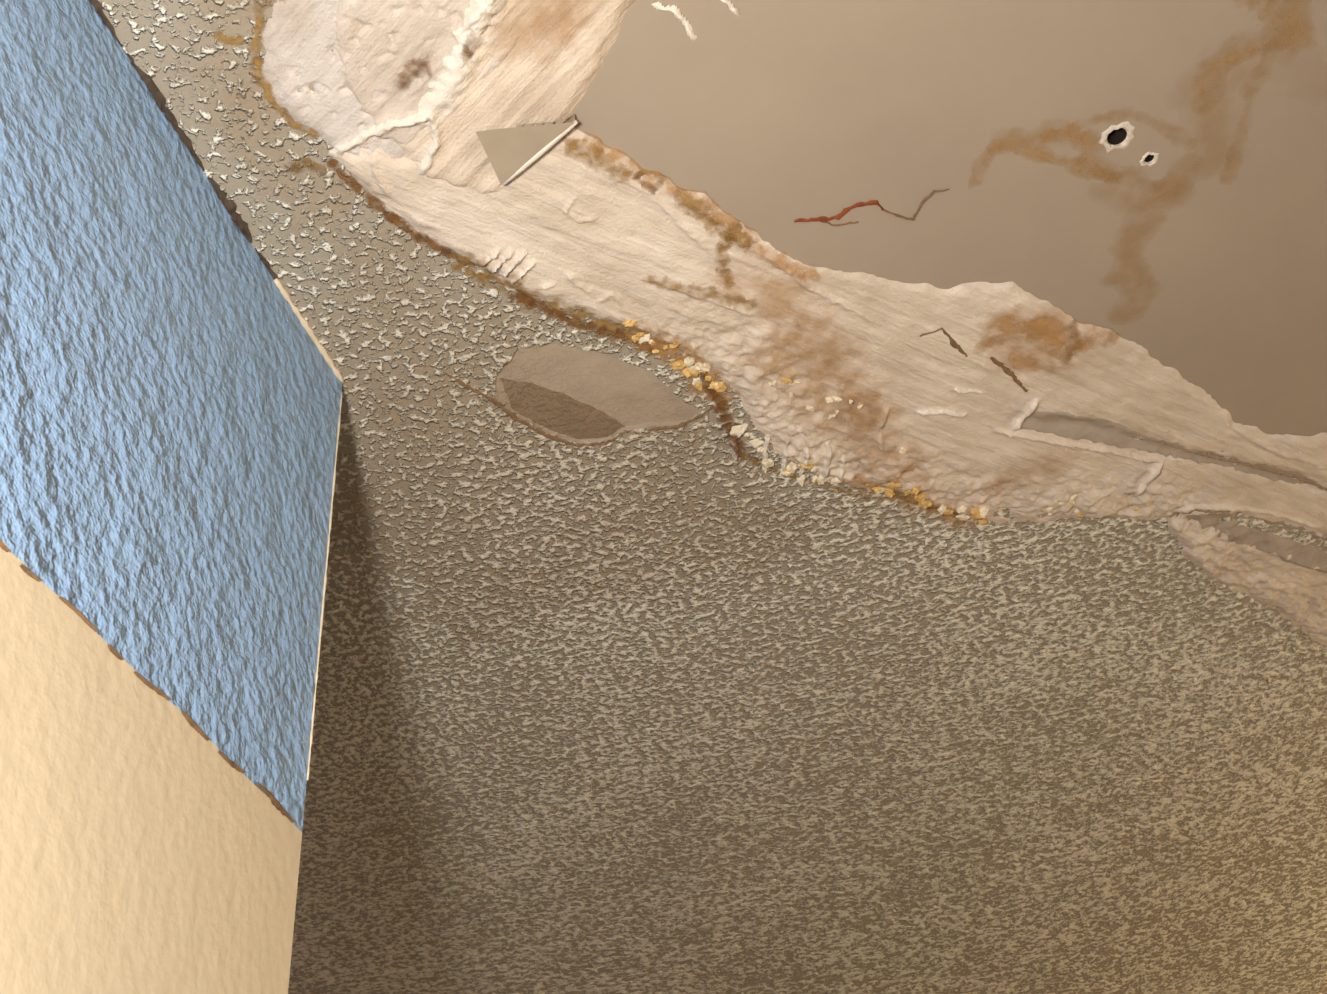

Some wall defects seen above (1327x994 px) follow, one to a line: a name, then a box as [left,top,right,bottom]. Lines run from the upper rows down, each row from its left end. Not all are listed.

spalling [1098,121,1135,153]
spalling [1139,152,1159,167]
crack [794,188,950,226]
rust [292,158,775,470]
peeling [622,319,727,392]
rust [993,315,1080,368]
spalling [443,342,713,448]
peeling [806,396,864,419]
peeling [730,425,841,487]
rust [791,475,964,525]
peeling [866,481,989,525]